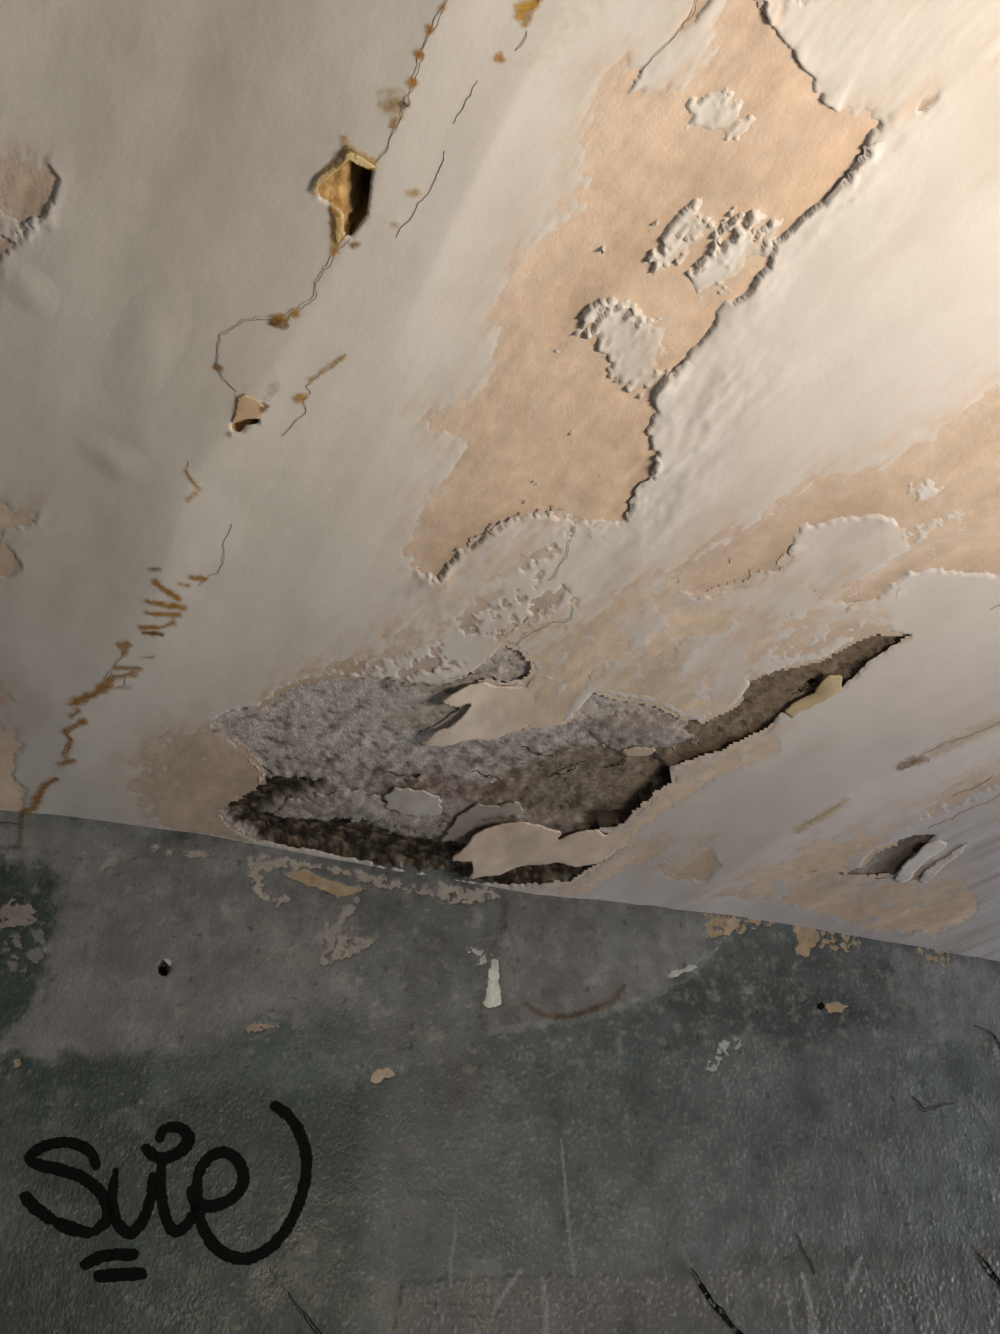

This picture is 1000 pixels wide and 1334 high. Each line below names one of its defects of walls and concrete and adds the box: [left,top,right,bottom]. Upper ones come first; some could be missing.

corrosion [516,0,540,26]
crack [640,0,698,73]
peeling [917,94,937,111]
peeling [0,149,62,255]
crack [216,222,355,390]
peeling [402,0,887,588]
corrosion [139,568,207,637]
spalling [125,385,1000,967]
peeling [0,724,27,811]
corrosion [19,641,153,837]
crack [692,1269,743,1334]
crack [979,1254,1000,1285]